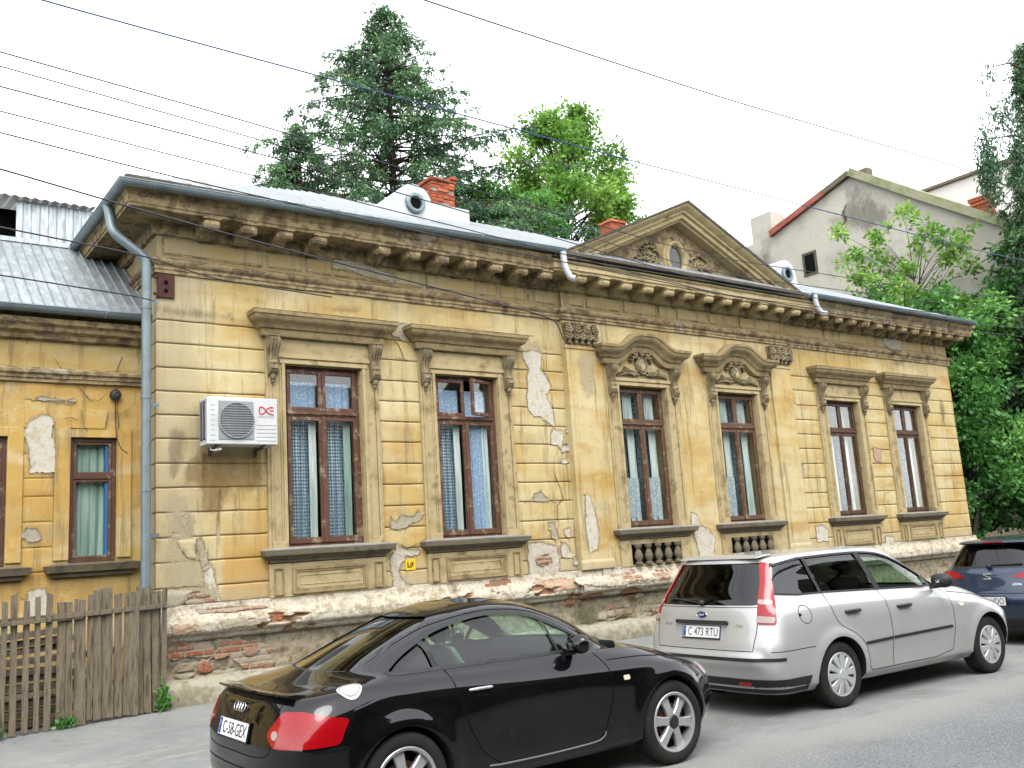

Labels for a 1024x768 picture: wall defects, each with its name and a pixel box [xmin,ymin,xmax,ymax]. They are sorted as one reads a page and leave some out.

peeling [24,395,77,475]
peeling [522,349,570,464]
peeling [21,526,42,544]
spalling [390,544,421,587]
spalling [389,511,424,530]
spalling [531,490,548,502]
peeling [584,493,601,554]
spalling [527,521,671,593]
spalling [691,512,715,556]
flaking render [167,530,273,670]